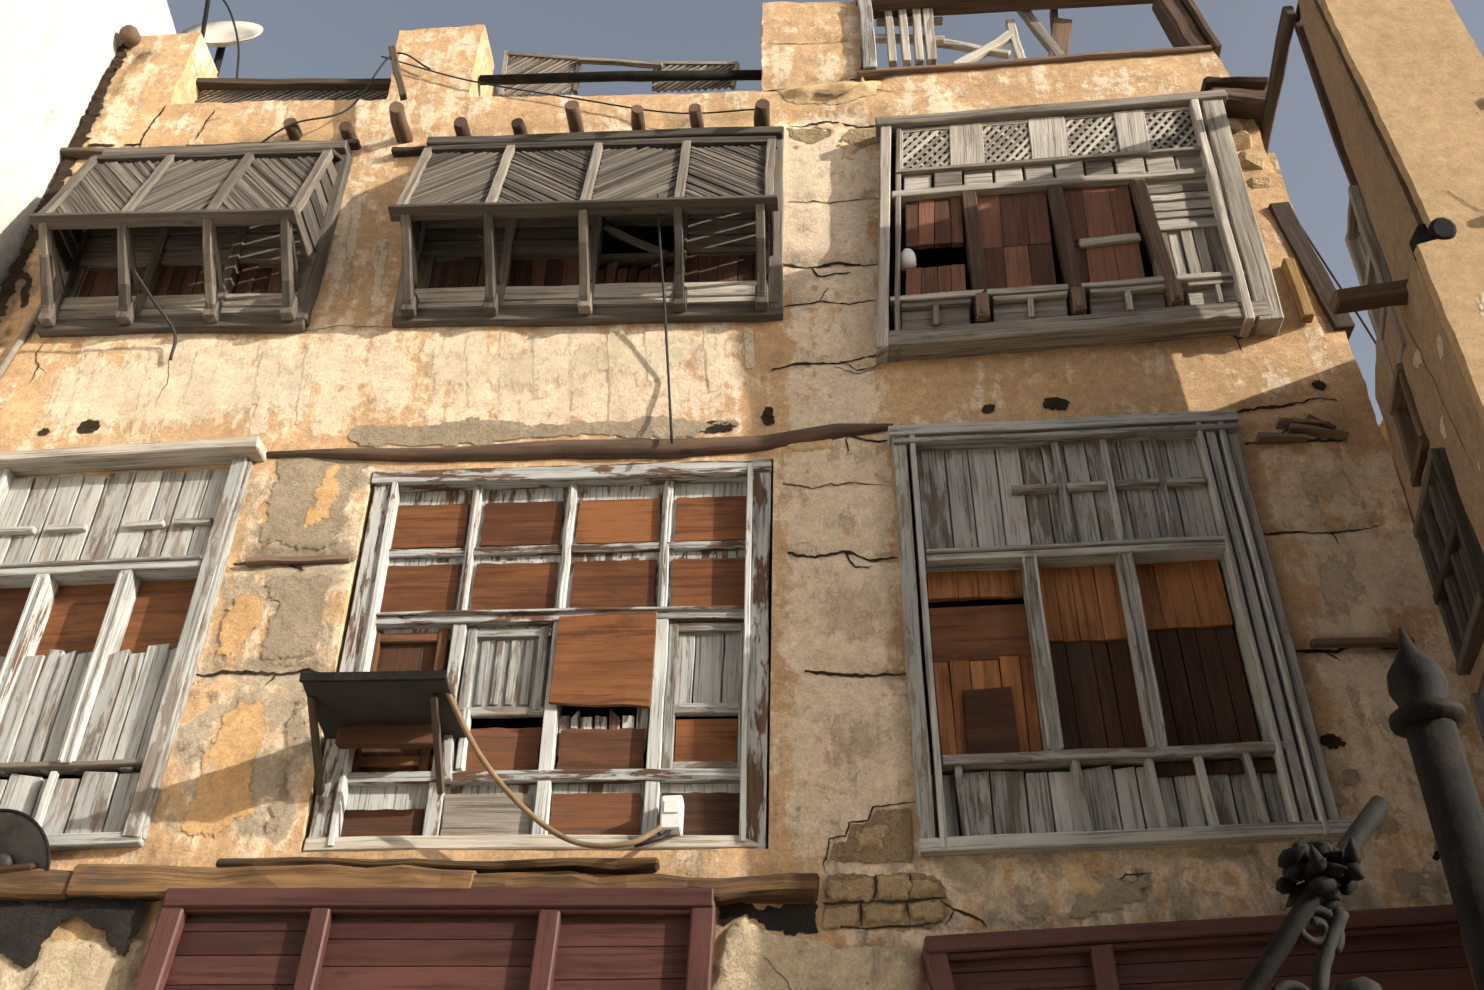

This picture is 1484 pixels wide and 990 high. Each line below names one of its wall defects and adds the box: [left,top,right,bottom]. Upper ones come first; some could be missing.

crack [783,261,877,307]
crack [772,354,881,374]
spalling [260,415,740,551]
spalling [217,573,332,666]
peeling [178,690,309,838]
flaking render [718,808,951,940]